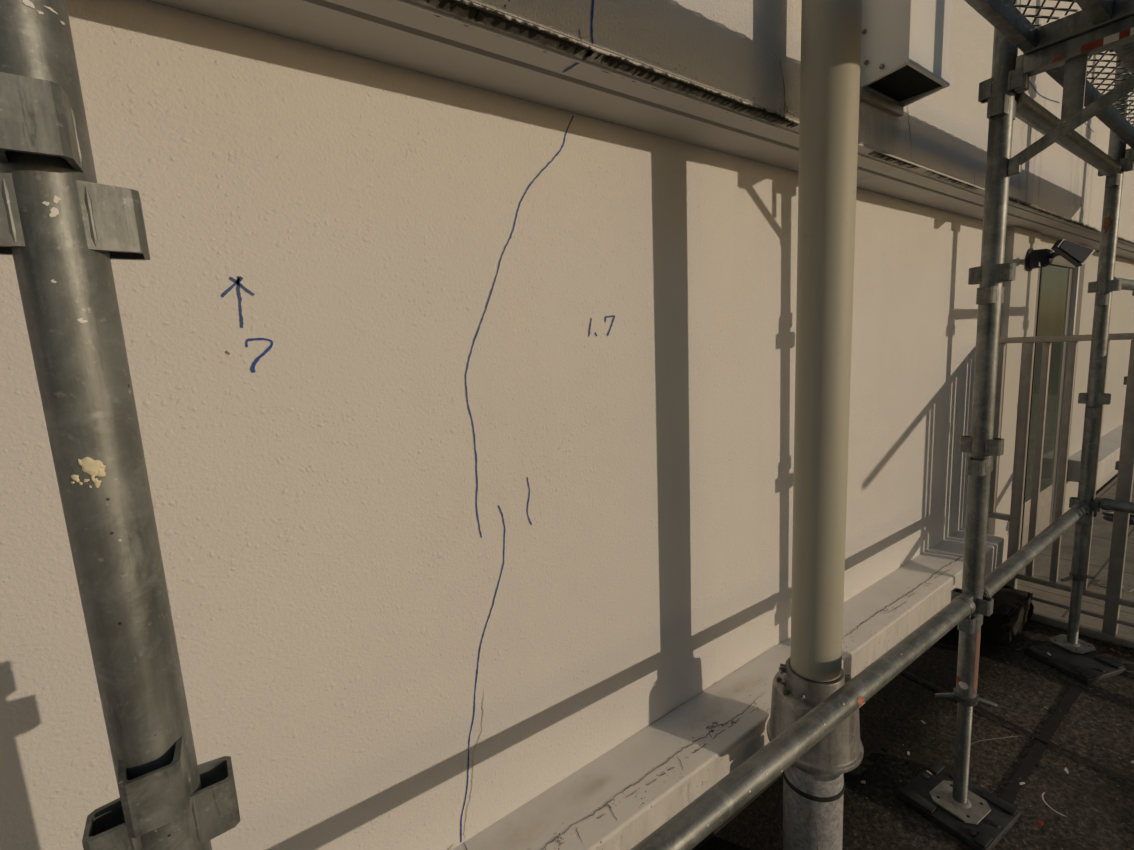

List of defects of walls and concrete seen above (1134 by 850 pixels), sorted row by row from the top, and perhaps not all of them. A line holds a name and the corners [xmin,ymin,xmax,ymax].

crack [842,556,963,639]
crack [447,688,484,850]
crack [541,694,763,850]